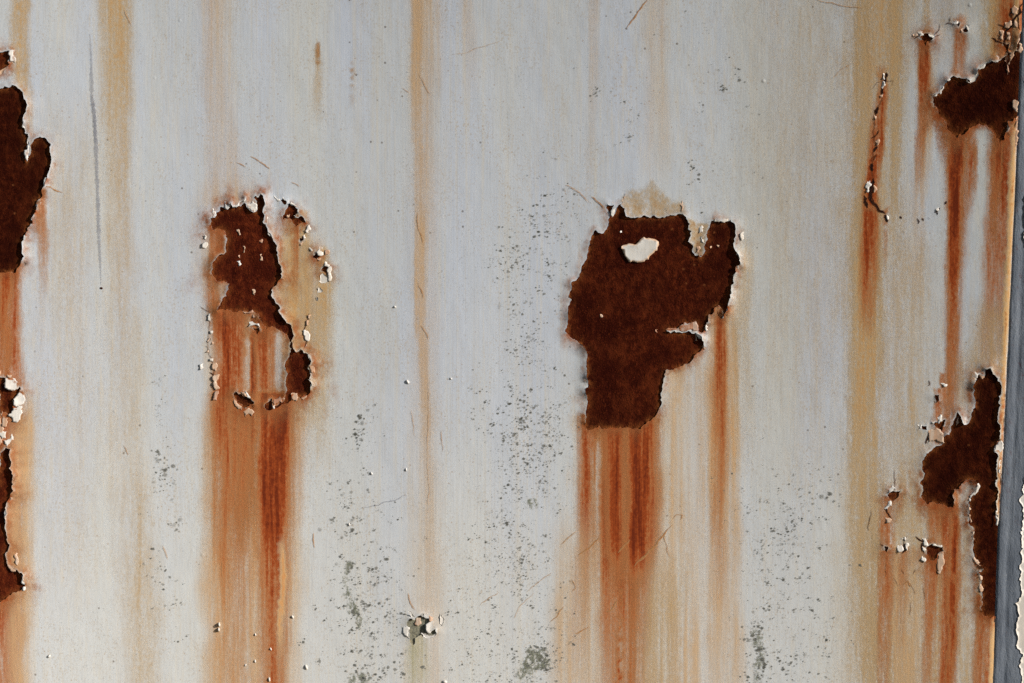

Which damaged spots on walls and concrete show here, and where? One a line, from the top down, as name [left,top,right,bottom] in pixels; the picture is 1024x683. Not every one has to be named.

peeling [0,371,27,607]
rust [0,267,33,683]
peeling [0,49,51,276]
rust [202,210,332,683]
peeling [202,188,333,420]
rust [578,364,698,683]
peeling [565,183,744,432]
rust [707,307,739,650]
rust [849,0,995,683]
peeling [915,368,1005,626]
rust [917,0,1016,514]
peeling [923,26,1022,147]